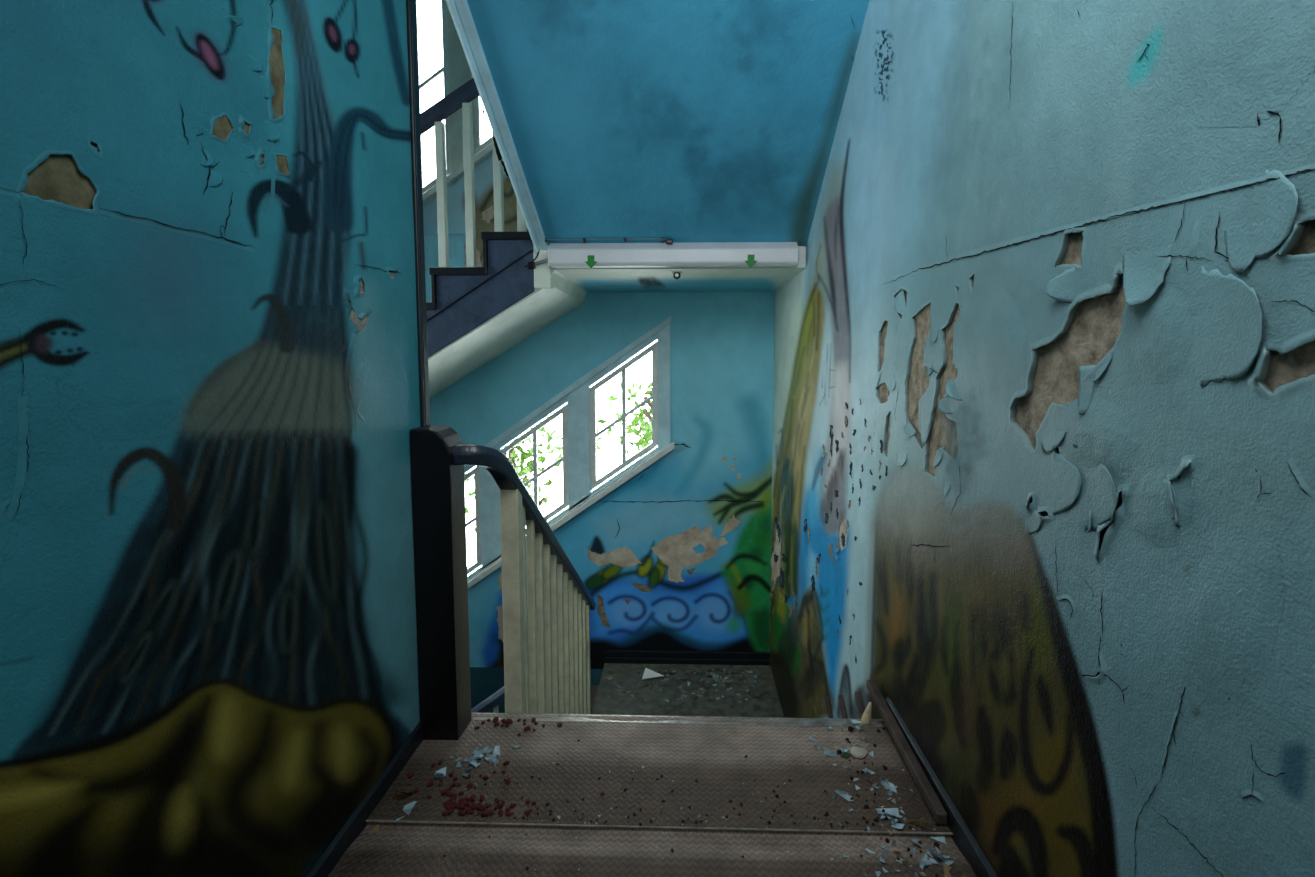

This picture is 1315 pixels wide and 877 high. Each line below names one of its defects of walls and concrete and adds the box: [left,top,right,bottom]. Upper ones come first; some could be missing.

water stain [876,31,893,98]
peeling [16,150,101,216]
crack [880,111,1315,286]
crack [0,202,60,288]
peeling [1200,169,1315,399]
peeling [1008,223,1172,564]
peeling [770,271,976,618]
peeling [1163,454,1196,528]
peeling [584,514,742,605]
peeling [595,594,612,629]
crack [1129,687,1223,877]
crack [1239,744,1289,804]